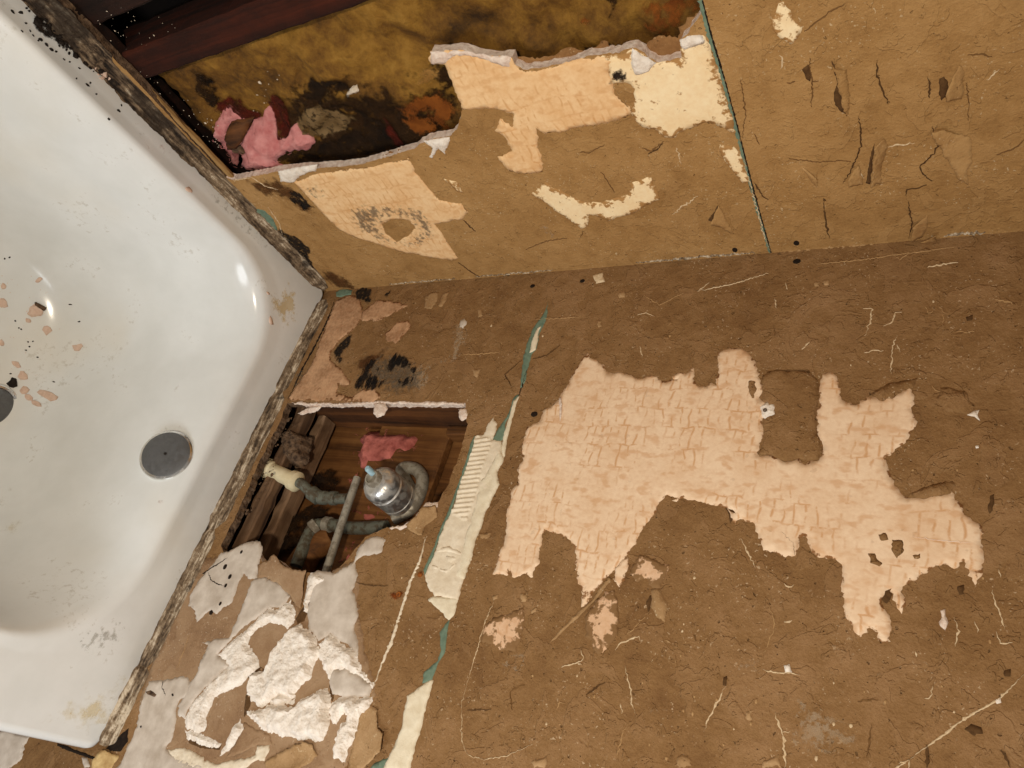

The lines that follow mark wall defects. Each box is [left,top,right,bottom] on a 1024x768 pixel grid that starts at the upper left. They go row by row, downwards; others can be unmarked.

damp [191,64,456,164]
peeling [278,158,468,261]
peeling [428,35,749,229]
crack [789,116,862,182]
crack [822,198,830,238]
crack [876,63,888,103]
crack [905,128,939,239]
damp [334,335,351,363]
peeling [288,295,467,421]
damp [355,350,421,392]
peeling [493,348,984,654]
flaking render [184,538,426,768]